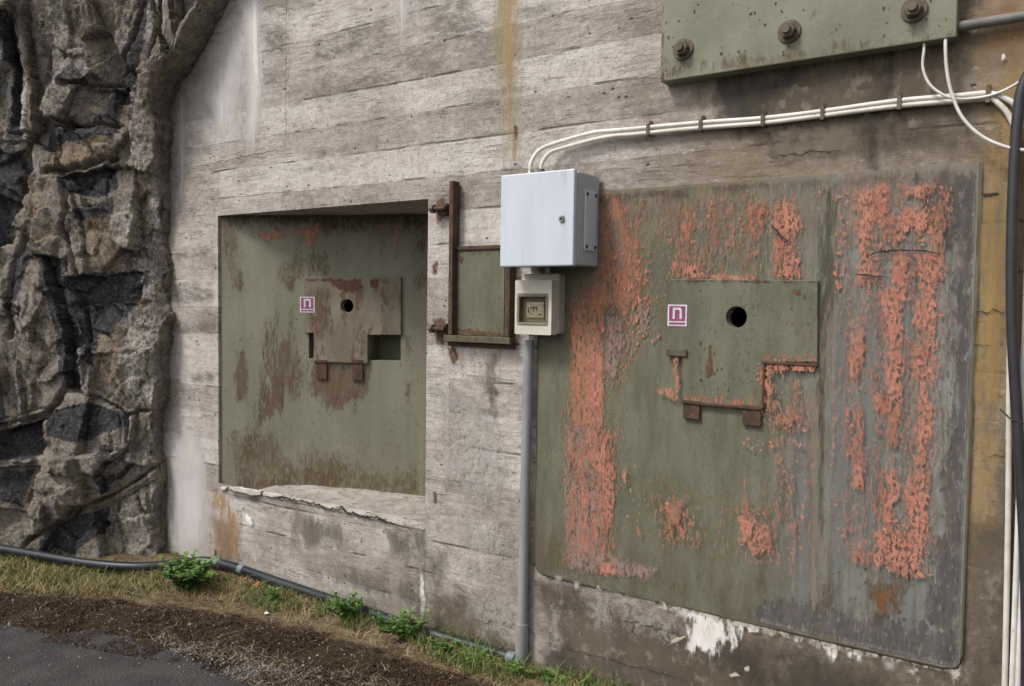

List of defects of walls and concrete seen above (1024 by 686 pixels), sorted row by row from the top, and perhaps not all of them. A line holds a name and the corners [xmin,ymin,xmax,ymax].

damp [494,0,552,111]
rust [233,310,416,494]
rust [219,197,443,256]
peeling [560,189,823,582]
peeling [828,175,954,579]
damp [902,228,914,414]
damp [975,164,1006,420]
crack [260,494,409,551]
damp [539,431,1015,686]